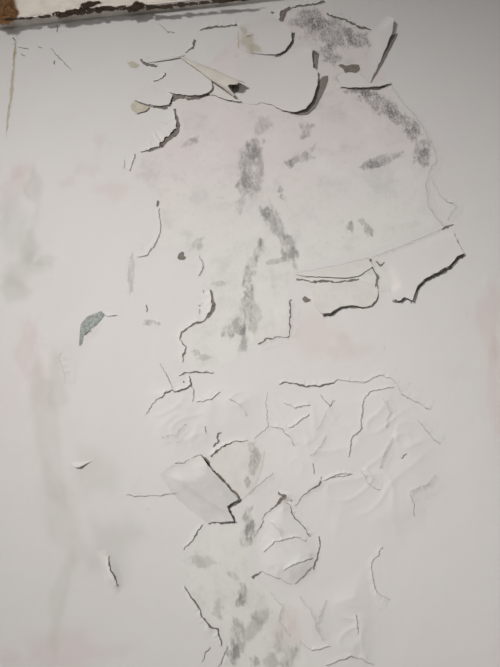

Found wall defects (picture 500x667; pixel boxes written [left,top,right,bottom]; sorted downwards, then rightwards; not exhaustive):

corrosion [0,0,18,25]
peeling [130,1,464,374]
crack [136,200,161,257]
spalling [79,311,115,345]
crack [147,254,464,651]
crack [102,555,118,587]
peeling [161,440,312,667]
crack [178,586,228,667]